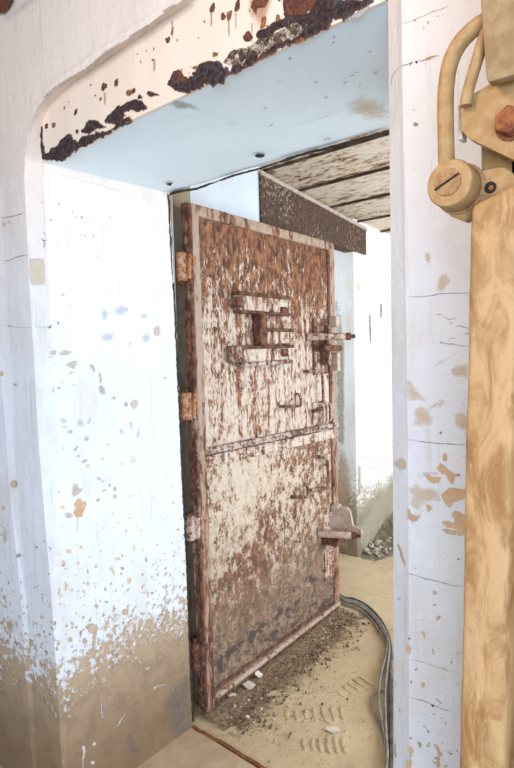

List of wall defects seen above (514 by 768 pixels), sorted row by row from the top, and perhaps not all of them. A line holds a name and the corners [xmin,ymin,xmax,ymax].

corrosion [203,0,240,35]
corrosion [167,52,226,94]
corrosion [40,88,158,162]
peeling [426,453,465,536]